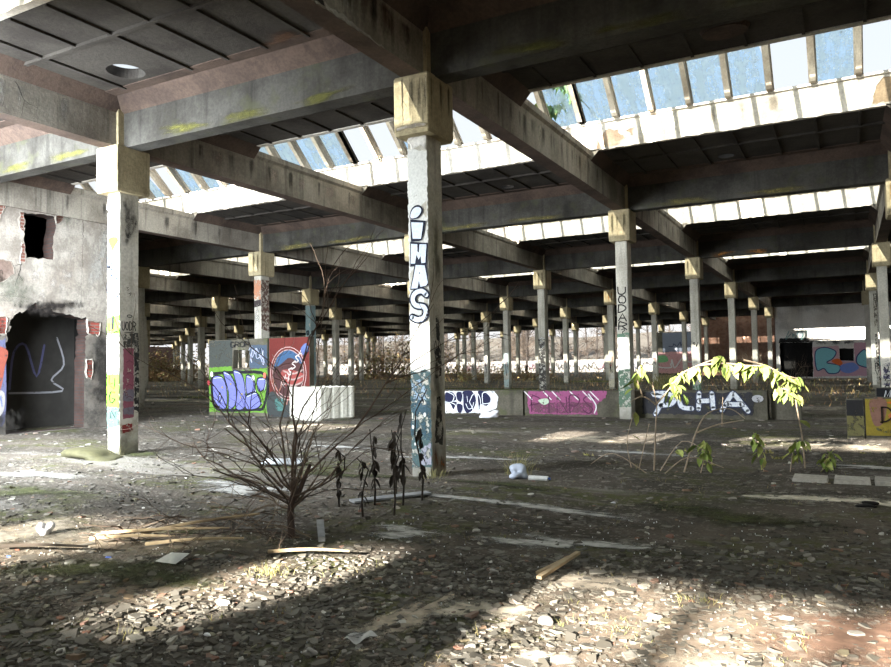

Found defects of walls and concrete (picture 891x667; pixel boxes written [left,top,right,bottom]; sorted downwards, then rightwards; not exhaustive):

leakage [124,202,136,243]